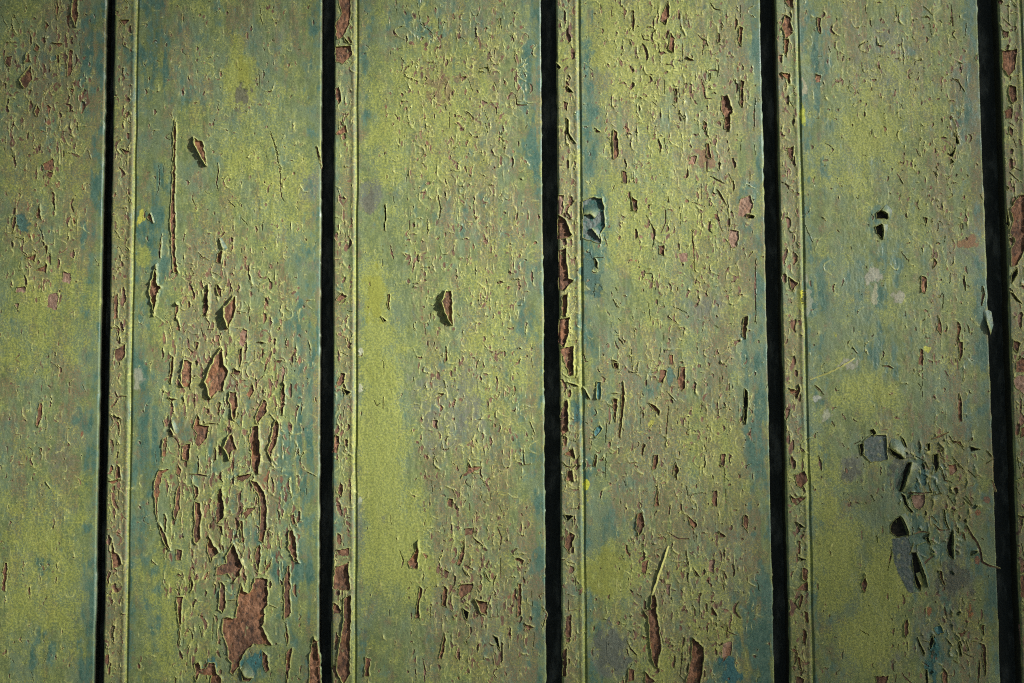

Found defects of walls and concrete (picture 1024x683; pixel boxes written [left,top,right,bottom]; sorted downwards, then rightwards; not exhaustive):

peeling [193,137,208,167]
peeling [35,191,56,220]
peeling [875,204,892,240]
peeling [25,245,49,273]
peeling [441,290,454,326]
peeling [557,195,625,482]
peeling [154,283,286,683]
peeling [858,428,958,593]
peeling [283,514,299,683]
peeling [627,584,671,683]
peeling [309,636,322,683]
peeling [686,637,705,683]